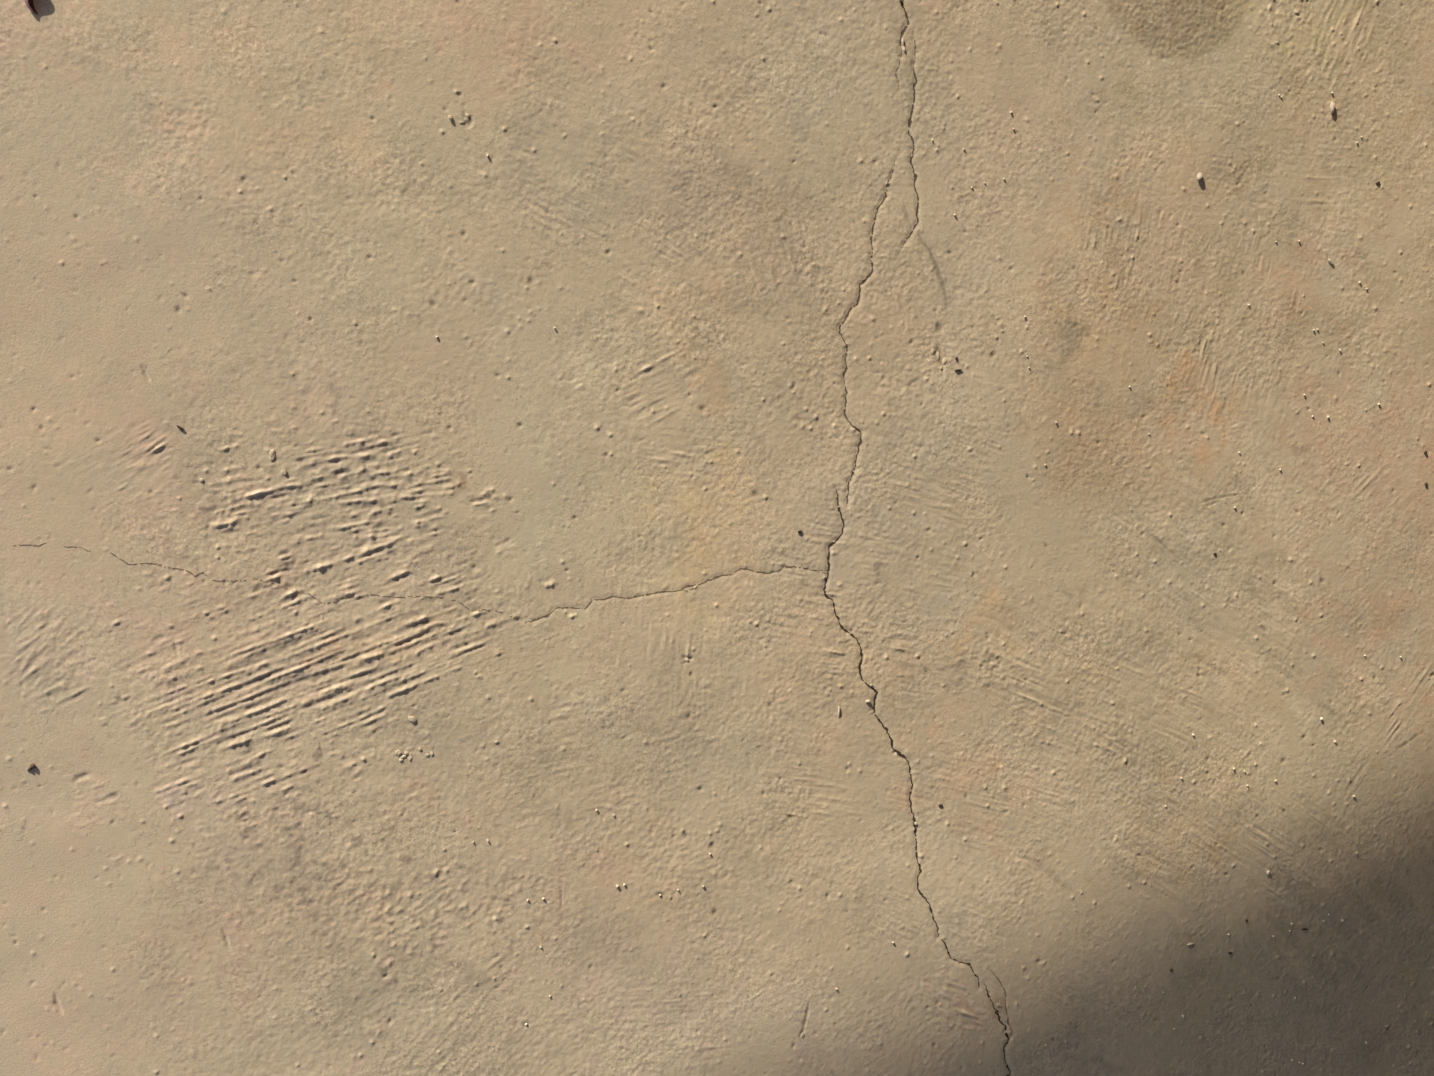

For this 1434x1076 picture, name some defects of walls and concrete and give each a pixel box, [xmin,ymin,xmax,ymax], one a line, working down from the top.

crack [13,0,1013,1076]
damp [1098,0,1253,63]